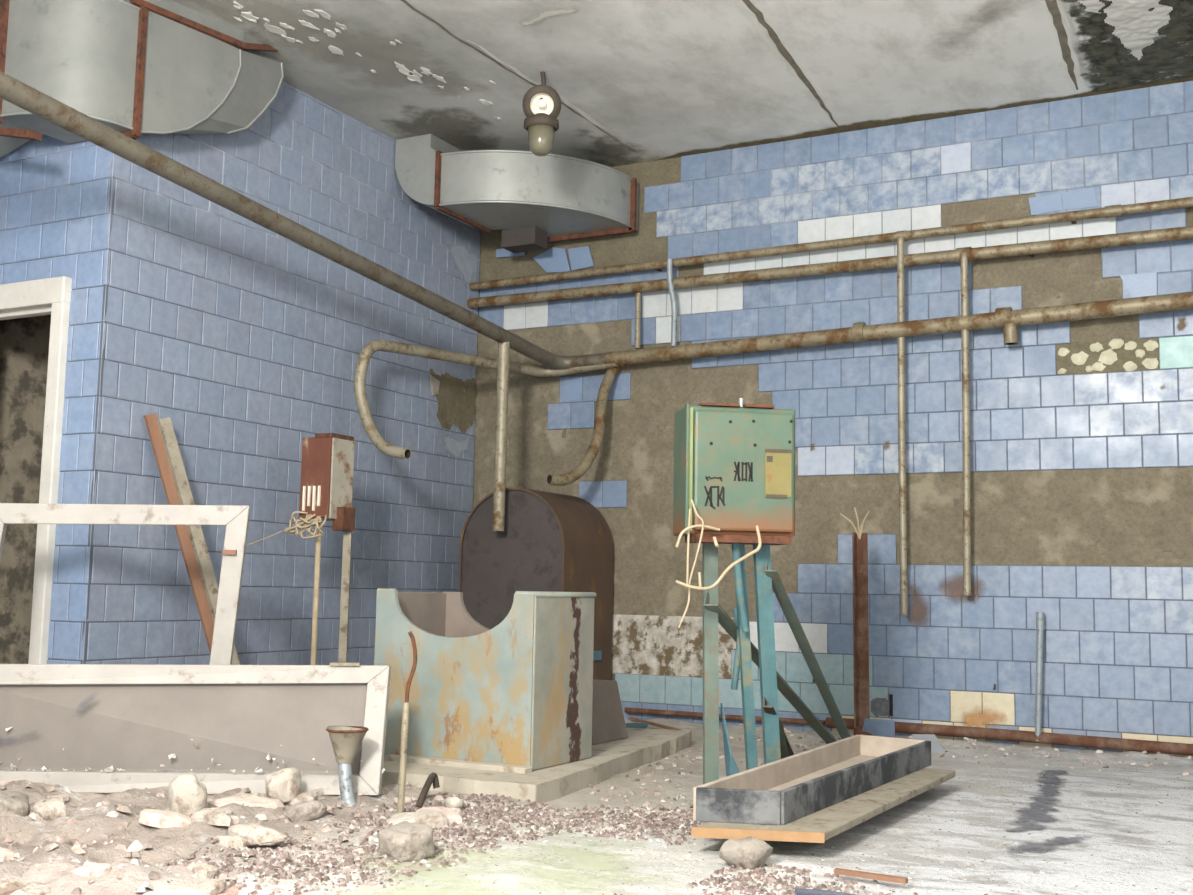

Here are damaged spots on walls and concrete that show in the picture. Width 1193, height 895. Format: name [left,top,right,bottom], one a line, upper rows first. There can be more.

peeling [233,1,361,57]
peeling [394,61,446,89]
leakage [396,110,495,150]
leakage [591,139,639,166]
peeling [479,157,704,282]
peeling [942,194,1035,227]
peeling [972,248,1157,309]
peeling [1060,314,1153,345]
peeling [429,320,772,621]
peeling [770,448,1193,593]
rust [965,713,998,727]